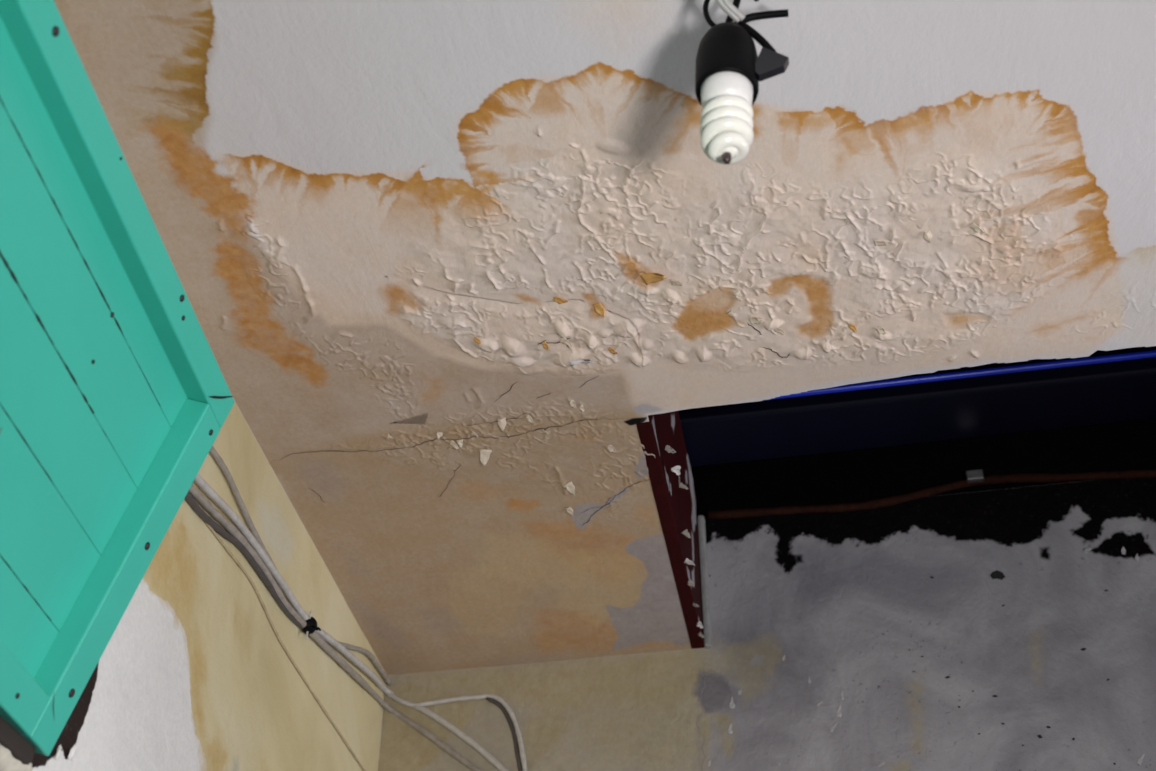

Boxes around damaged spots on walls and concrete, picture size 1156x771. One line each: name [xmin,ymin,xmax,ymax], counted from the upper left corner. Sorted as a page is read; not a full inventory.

damp [54,0,1156,451]
peeling [1035,271,1156,348]
crack [275,383,623,497]
damp [140,506,241,771]
damp [252,489,300,578]
peeling [292,394,705,651]
damp [263,423,790,771]
crack [581,479,650,525]
damp [705,478,1156,577]
spalling [1081,529,1156,562]
peeling [32,662,99,768]